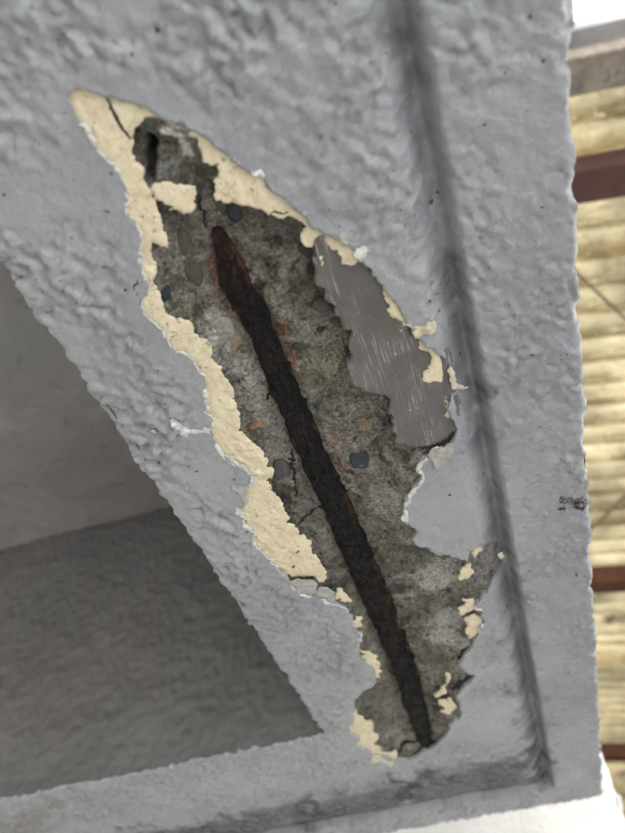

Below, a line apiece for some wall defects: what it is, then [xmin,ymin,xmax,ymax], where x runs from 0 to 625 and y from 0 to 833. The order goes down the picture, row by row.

spalling [69,89,505,767]